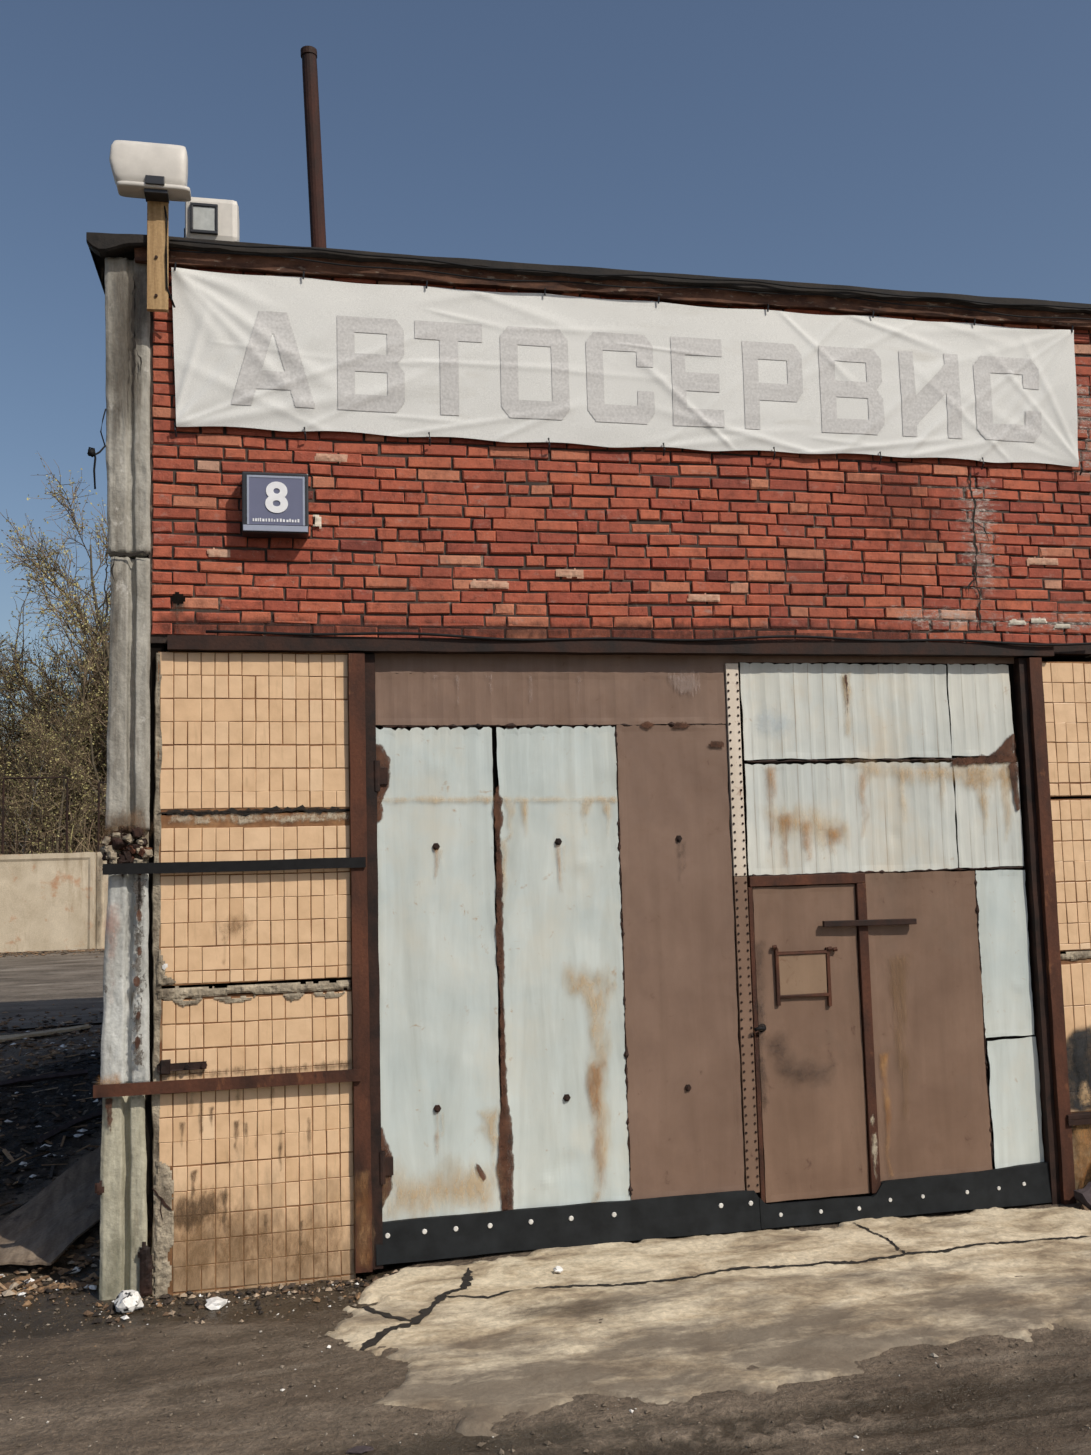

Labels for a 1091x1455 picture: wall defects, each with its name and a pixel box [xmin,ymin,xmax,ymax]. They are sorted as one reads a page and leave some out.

crack [967,466,989,634]
peeling [172,813,345,823]
rust [930,734,1020,810]
spalling [131,877,351,1066]
rust [400,786,514,1211]
crack [357,1222,1087,1351]